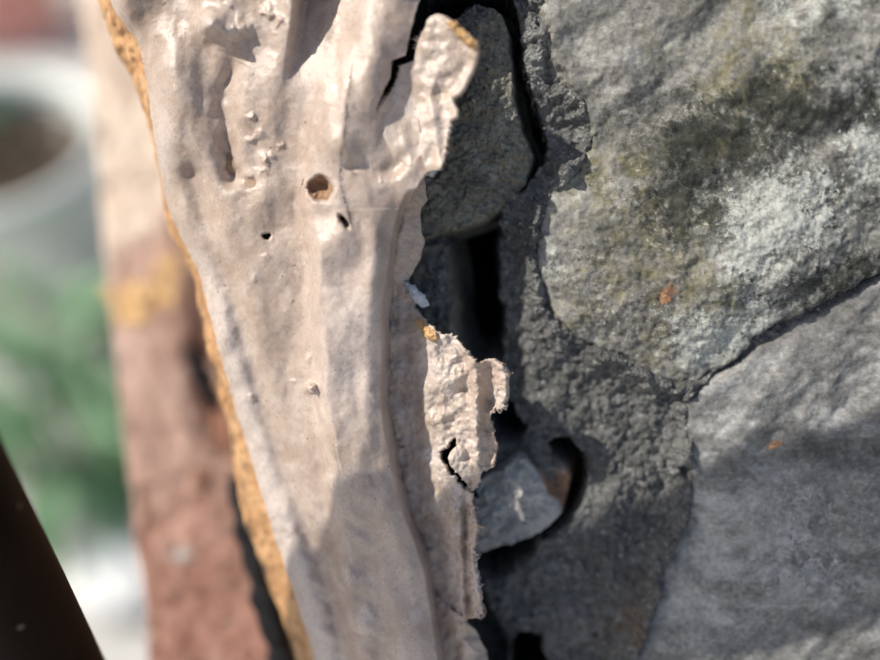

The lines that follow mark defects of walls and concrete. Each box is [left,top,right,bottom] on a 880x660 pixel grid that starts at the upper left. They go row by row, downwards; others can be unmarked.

peeling [381,14,512,660]
crack [441,438,479,498]
spalling [557,437,588,510]
spalling [512,631,547,660]